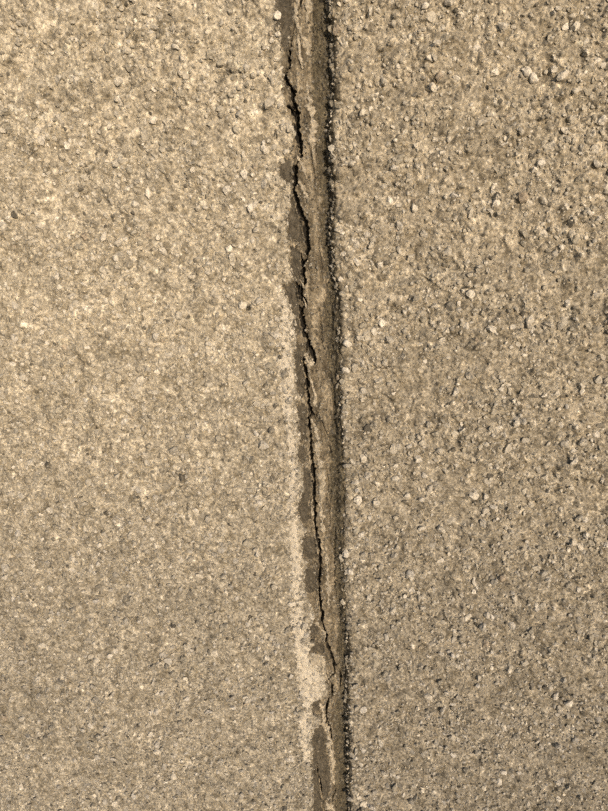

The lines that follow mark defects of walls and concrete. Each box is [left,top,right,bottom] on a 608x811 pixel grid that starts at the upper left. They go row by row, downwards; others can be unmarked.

crack [284,0,342,734]